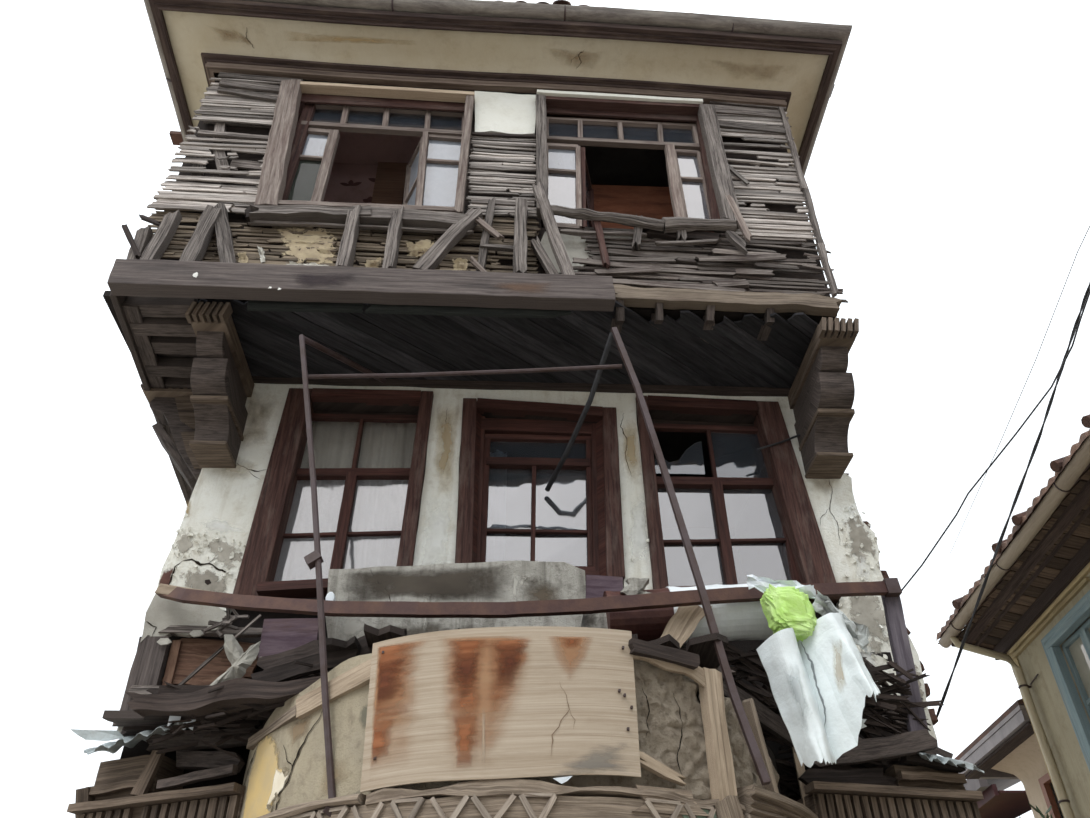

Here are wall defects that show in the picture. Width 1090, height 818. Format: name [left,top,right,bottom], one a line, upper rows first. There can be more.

crack [169,558,226,584]
peeling [159,527,246,592]
leakage [354,568,498,602]
peeling [839,507,889,581]
leakage [342,618,364,635]
leakage [406,618,444,636]
corrosion [557,637,585,666]
peeling [838,596,889,664]
corrosion [373,644,413,755]
corrosion [452,637,524,759]
crack [551,685,575,754]
flaking render [243,736,289,818]